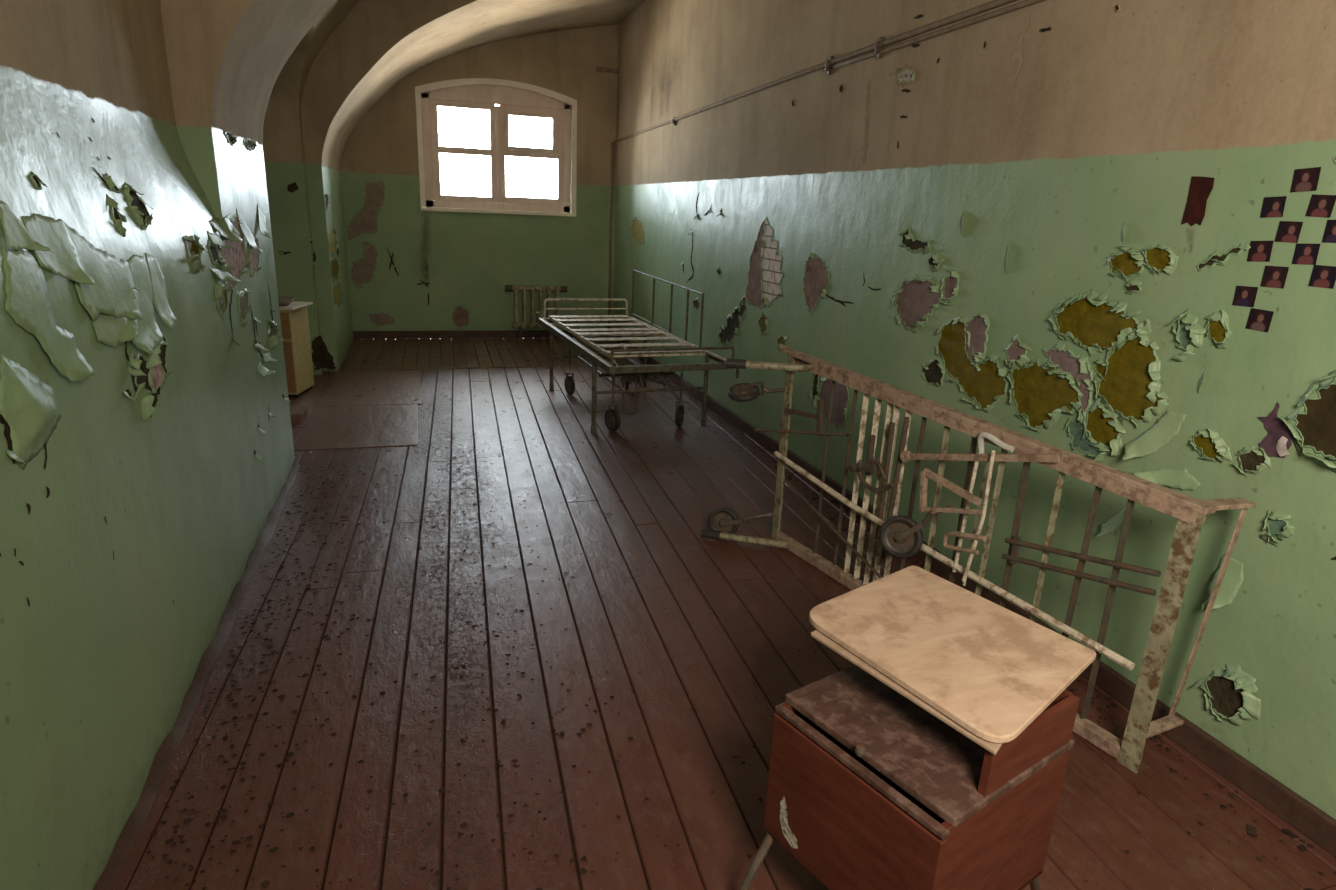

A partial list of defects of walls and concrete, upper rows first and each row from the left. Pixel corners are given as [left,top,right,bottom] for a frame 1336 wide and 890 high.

peeling [29,171,47,190]
peeling [0,200,177,422]
peeling [103,173,153,237]
peeling [182,204,273,328]
peeling [253,320,283,377]
flaking render [327,180,386,289]
flaking render [718,217,787,352]
flaking render [803,253,830,315]
peeling [890,221,1271,491]
flaking render [1278,370,1336,473]
peeling [1259,510,1295,547]
peeling [1189,664,1261,726]